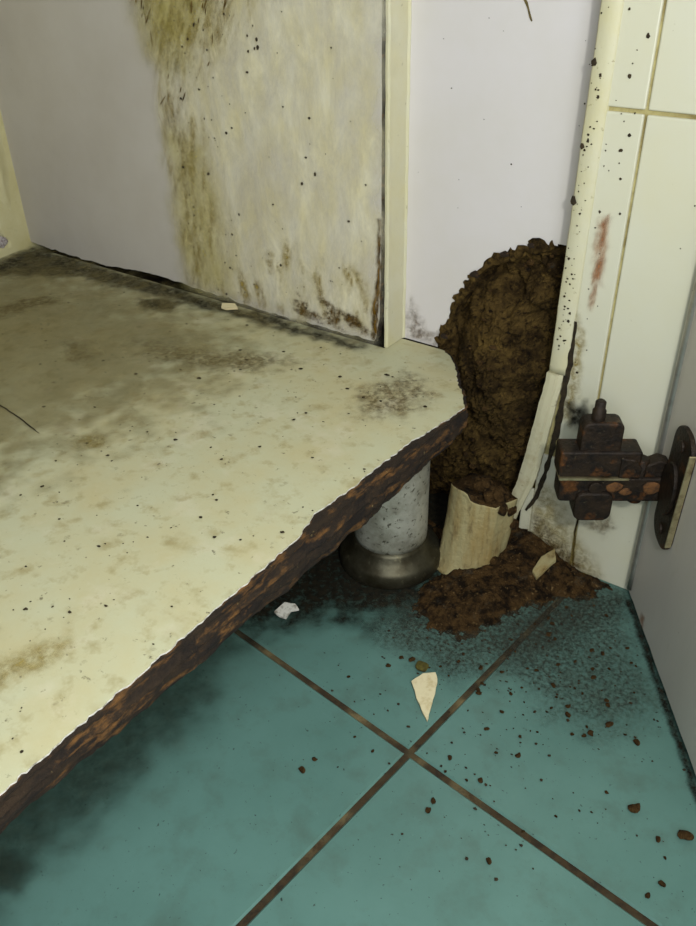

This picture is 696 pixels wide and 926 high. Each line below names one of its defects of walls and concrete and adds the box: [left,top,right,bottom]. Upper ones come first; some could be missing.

damp [135,0,382,333]
corrosion [591,223,605,304]